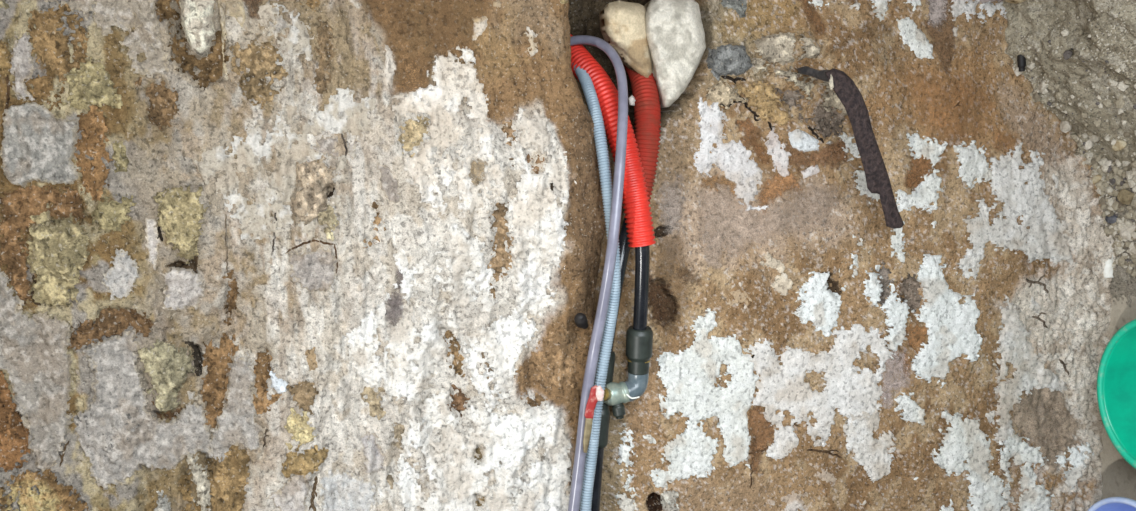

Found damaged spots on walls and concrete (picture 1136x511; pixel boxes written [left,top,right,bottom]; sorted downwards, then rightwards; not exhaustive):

spalling [752,32,847,138]
spalling [877,261,922,314]
spalling [648,490,679,511]